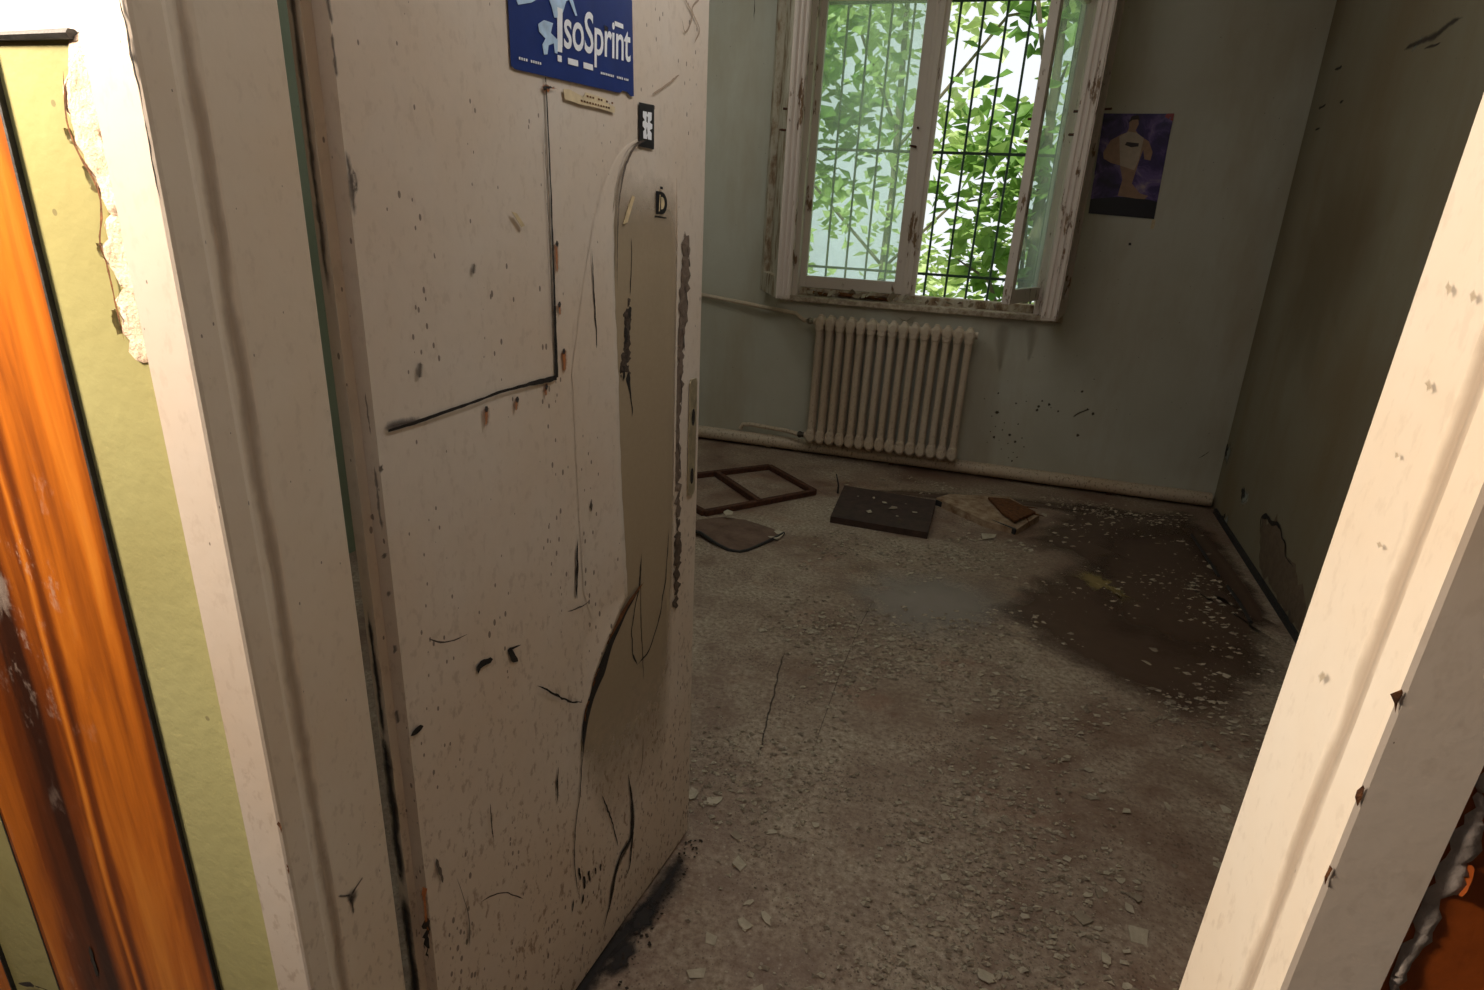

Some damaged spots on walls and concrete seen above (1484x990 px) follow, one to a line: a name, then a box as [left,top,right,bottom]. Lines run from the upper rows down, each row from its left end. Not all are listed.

flaking render [63,33,148,363]
water stain [1006,499,1267,711]
flaking render [1259,513,1306,632]
peeling [1355,786,1365,806]
peeling [1390,689,1403,712]
spalling [1389,772,1484,990]